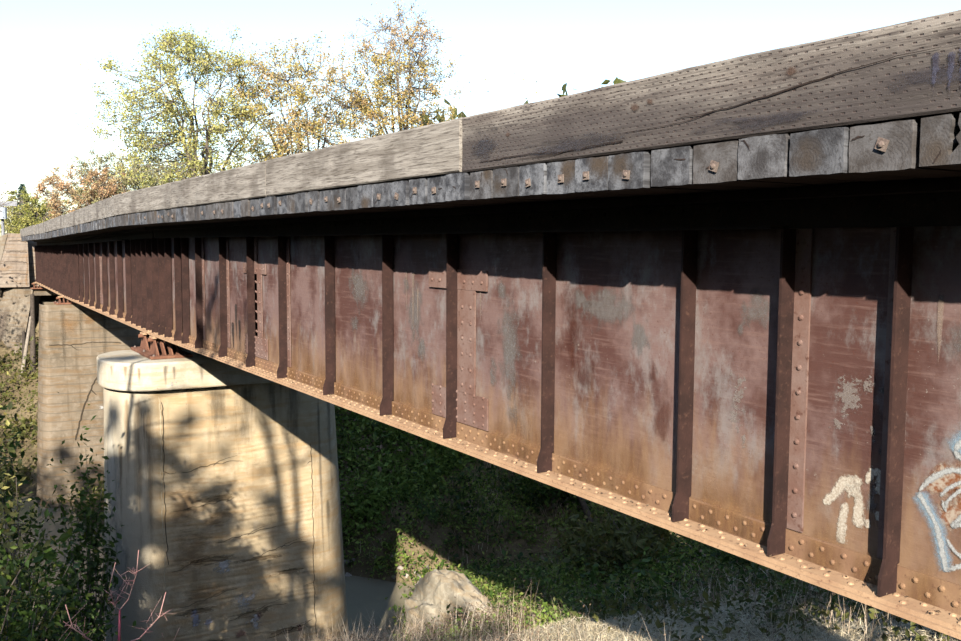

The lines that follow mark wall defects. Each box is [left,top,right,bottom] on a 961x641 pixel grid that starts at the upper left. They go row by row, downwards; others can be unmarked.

crack [480,47,961,182]
peeling [834,375,875,429]
corrosion [489,423,538,464]
corrosion [565,454,607,487]
corrosion [621,468,640,499]
corrosion [693,498,764,544]
corrosion [810,543,831,568]
corrosion [860,565,879,586]
corrosion [918,582,930,603]